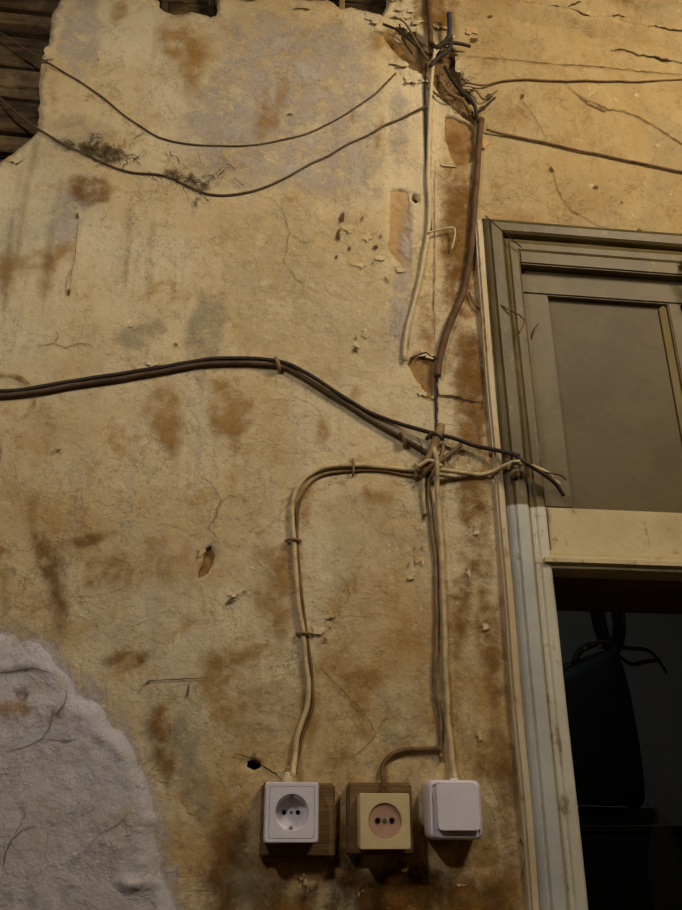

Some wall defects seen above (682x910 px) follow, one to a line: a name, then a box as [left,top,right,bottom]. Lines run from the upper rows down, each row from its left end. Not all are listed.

spalling [384,0,492,167]
water stain [72,176,108,202]
peeling [335,211,363,241]
spalling [350,190,418,338]
water stain [442,134,488,461]
water stain [461,466,487,524]
spalling [197,546,215,578]
water stain [450,560,483,659]
crack [0,666,49,674]
crack [6,690,79,752]
crack [1,806,35,871]
water stain [251,824,512,910]